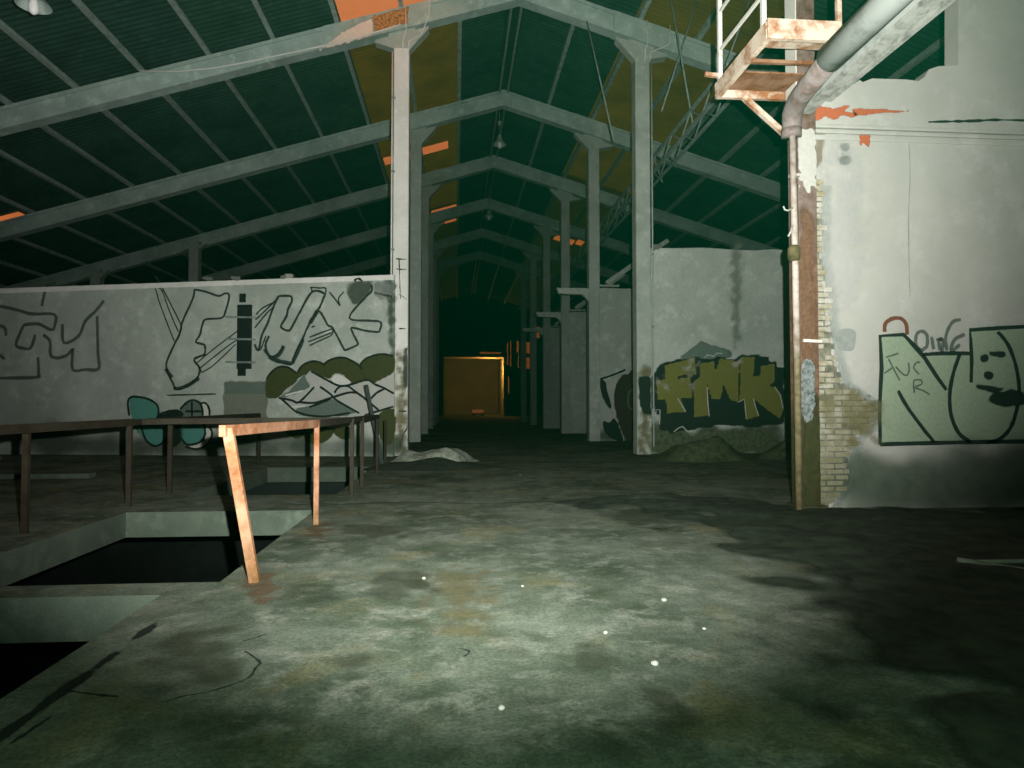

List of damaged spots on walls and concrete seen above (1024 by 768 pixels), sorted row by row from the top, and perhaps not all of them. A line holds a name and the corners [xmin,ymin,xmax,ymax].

leakage [21,431,314,456]
leakage [345,280,408,454]
leakage [732,249,740,338]
rust [799,211,816,367]
flaking render [798,105,908,508]
crack [166,634,266,702]